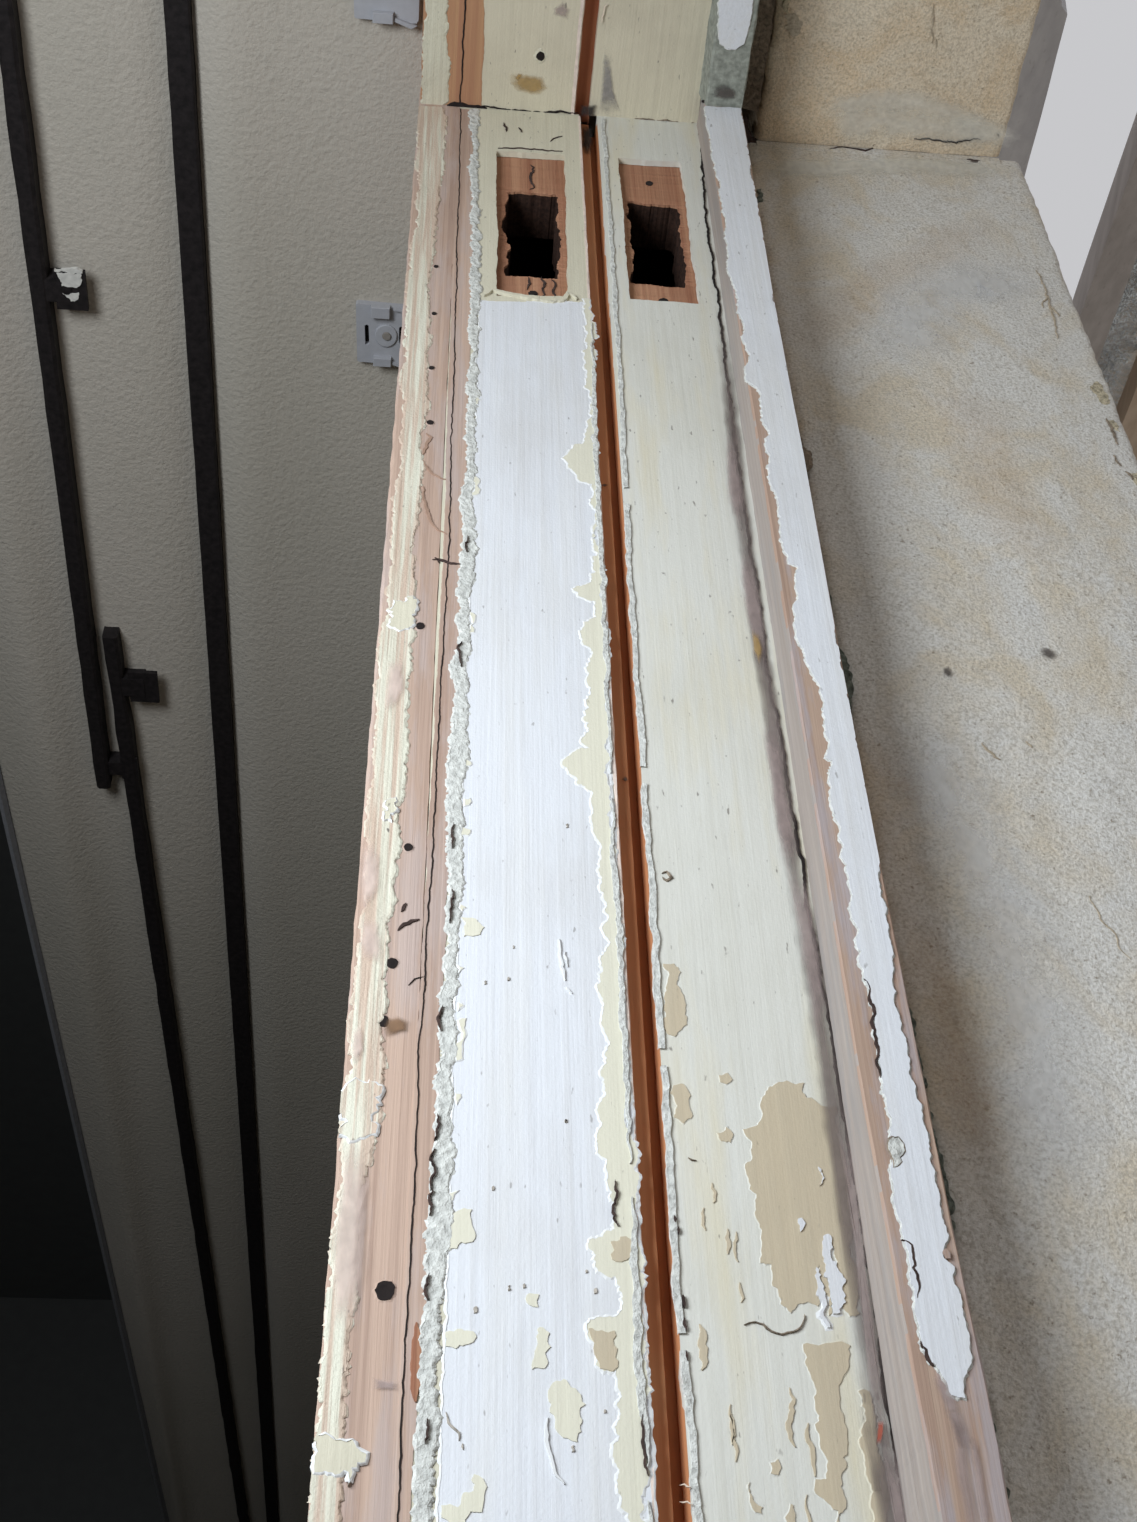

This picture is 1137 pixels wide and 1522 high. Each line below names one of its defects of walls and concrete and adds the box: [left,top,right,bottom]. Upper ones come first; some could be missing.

peeling [307,0,658,1522]
peeling [703,106,974,1401]
peeling [662,963,688,1038]
peeling [669,1083,693,1125]
peeling [682,1295,708,1370]
peeling [717,1080,904,1522]